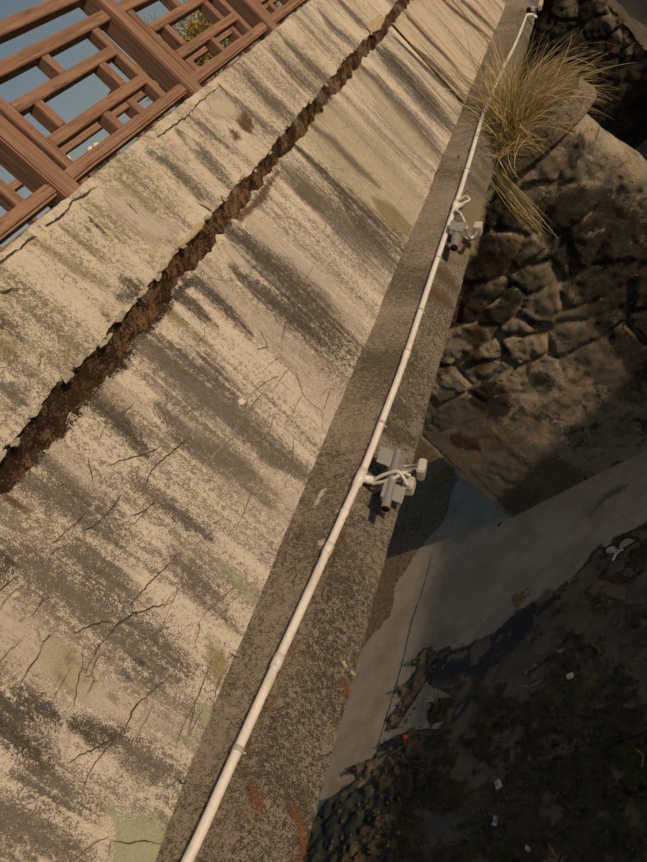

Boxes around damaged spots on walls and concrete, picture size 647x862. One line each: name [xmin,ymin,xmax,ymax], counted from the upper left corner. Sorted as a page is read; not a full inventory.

crack [0,186,97,263]
water stain [145,147,217,207]
crack [158,86,219,136]
water stain [81,330,311,541]
water stain [175,115,237,194]
crack [209,256,334,460]
water stain [171,202,376,423]
water stain [217,0,467,283]
water stain [375,396,416,448]
crack [0,404,185,687]
water stain [0,438,200,862]
crack [49,553,208,716]